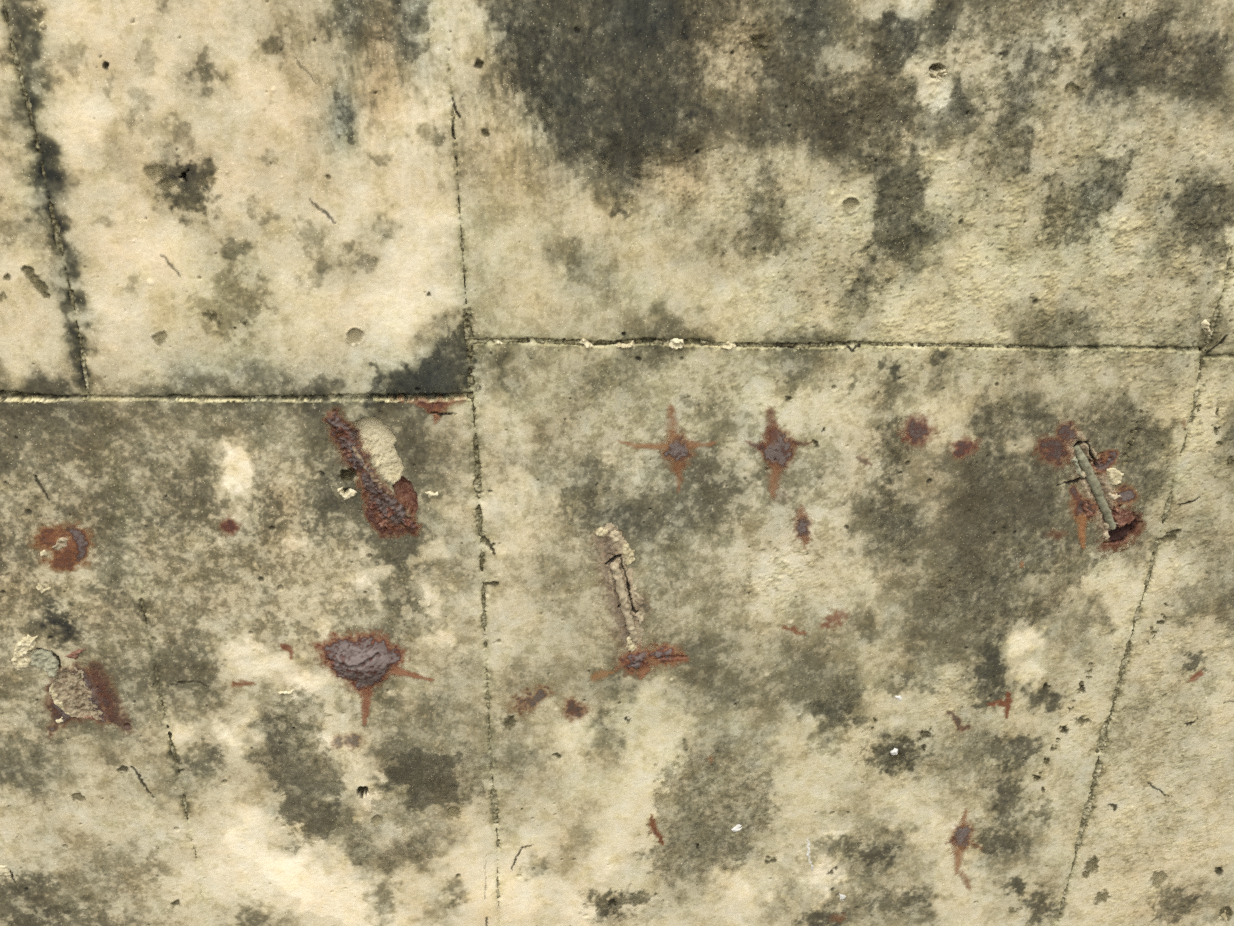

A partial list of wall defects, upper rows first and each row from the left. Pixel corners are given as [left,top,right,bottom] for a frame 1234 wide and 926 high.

damp [486,0,740,217]
damp [782,0,969,299]
rust [34,522,90,571]
spalling [325,411,438,537]
spalling [594,523,644,653]
rust [618,405,716,491]
rust [749,409,812,497]
damp [867,417,923,562]
damp [932,397,1169,633]
spalling [1035,421,1142,550]
spalling [11,634,131,731]
rust [949,810,982,888]